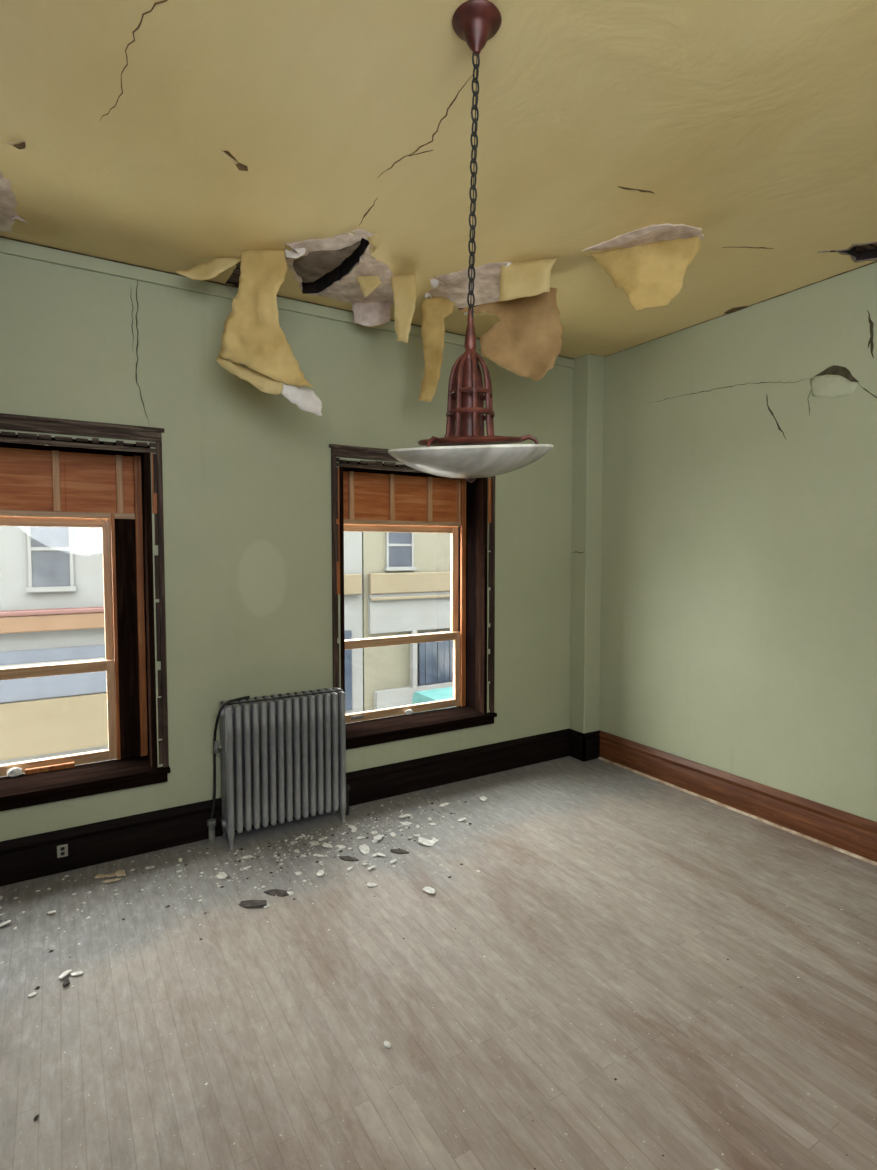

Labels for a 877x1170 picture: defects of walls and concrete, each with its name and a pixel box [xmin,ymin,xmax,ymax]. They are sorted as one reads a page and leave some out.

crack [100,0,168,120]
crack [359,75,473,225]
flaking render [0,170,28,232]
flaking render [583,224,704,310]
flaking render [817,241,877,263]
crack [130,280,150,426]
flaking render [175,229,564,416]
crack [866,310,874,358]
crack [645,379,812,440]